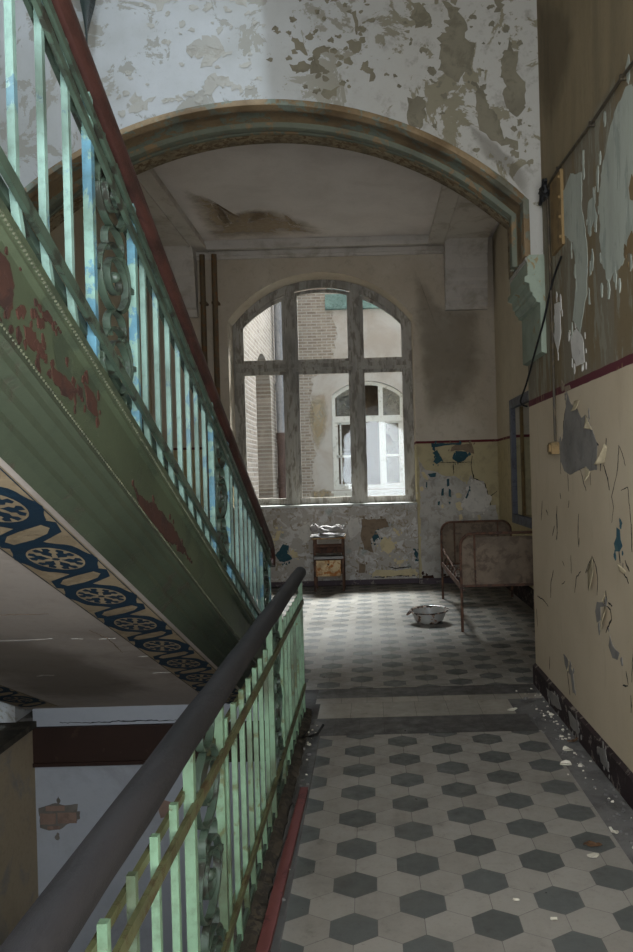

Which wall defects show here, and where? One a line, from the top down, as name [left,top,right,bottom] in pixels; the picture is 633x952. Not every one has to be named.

peeling [105,0,445,129]
peeling [402,0,534,167]
peeling [554,54,633,374]
peeling [559,391,598,482]
peeling [272,526,292,566]
peeling [356,440,498,578]
peeling [614,518,623,561]
peeling [595,596,623,666]
flaking render [38,797,80,840]